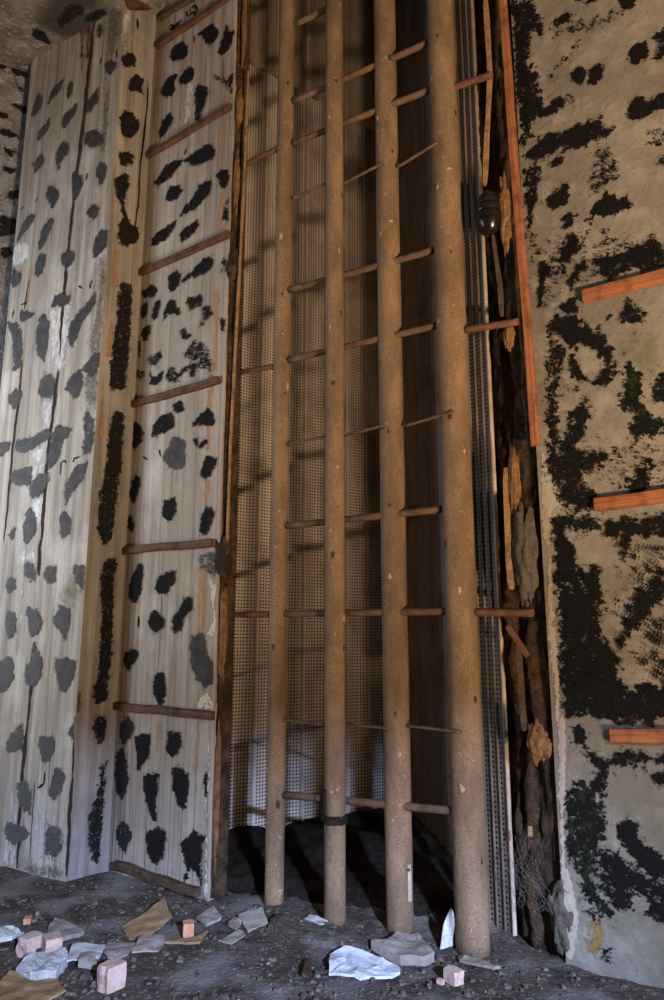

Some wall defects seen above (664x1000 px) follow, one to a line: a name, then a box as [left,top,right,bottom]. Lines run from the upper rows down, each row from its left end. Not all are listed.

damp [548,7,630,41]
damp [648,28,664,63]
damp [541,94,575,117]
damp [588,143,626,197]
damp [13,241,29,266]
damp [526,214,664,308]
damp [50,303,71,370]
damp [41,401,52,429]
damp [31,444,47,480]
damp [33,496,43,525]
damp [540,335,664,691]
damp [646,771,664,788]